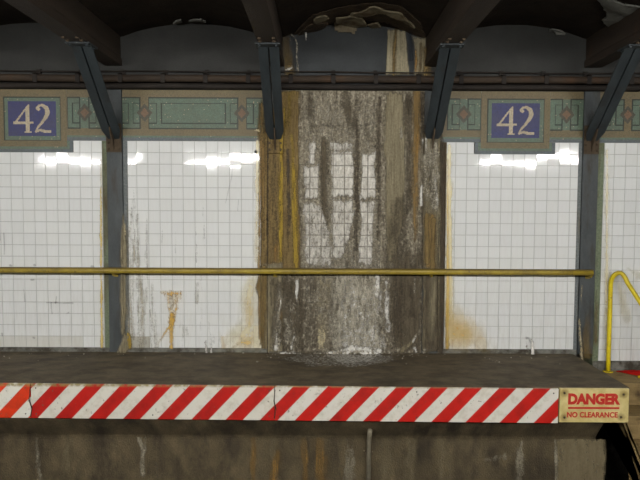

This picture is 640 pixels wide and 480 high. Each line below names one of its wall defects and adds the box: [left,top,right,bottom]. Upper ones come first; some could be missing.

flaking render [294,2,430,76]
damp [278,91,445,367]
rust [164,292,181,349]